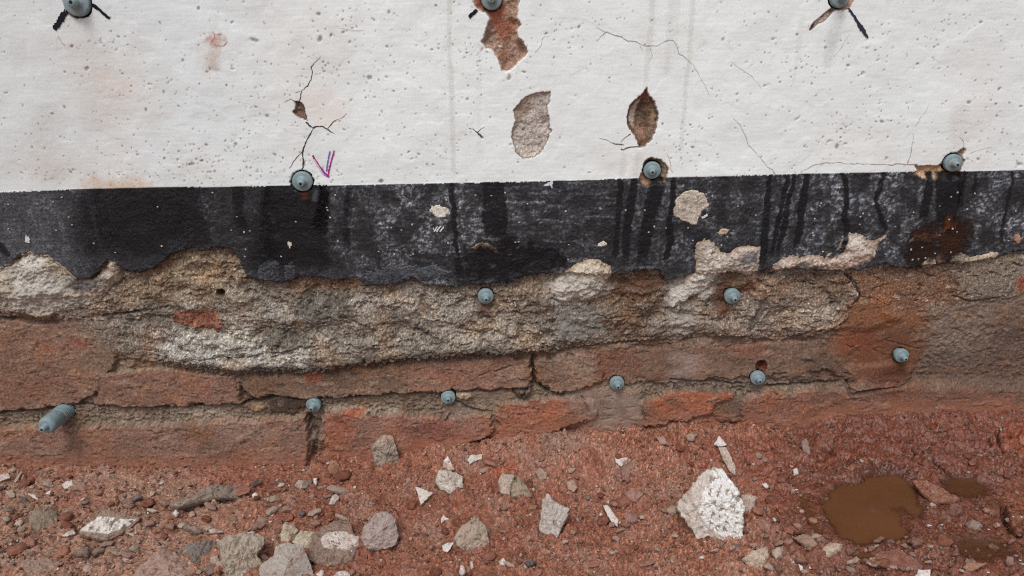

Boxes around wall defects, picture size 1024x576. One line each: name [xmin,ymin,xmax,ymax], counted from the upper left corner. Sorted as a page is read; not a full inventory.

spalling [473,0,527,71]
crack [597,27,709,94]
crack [285,62,346,171]
spalling [512,92,551,158]
spalling [627,89,658,146]
crack [803,105,929,171]
damp [257,183,329,265]
damp [448,182,566,284]
damp [612,176,676,261]
peeling [673,190,709,225]
damp [760,174,810,258]
rust [906,170,974,267]